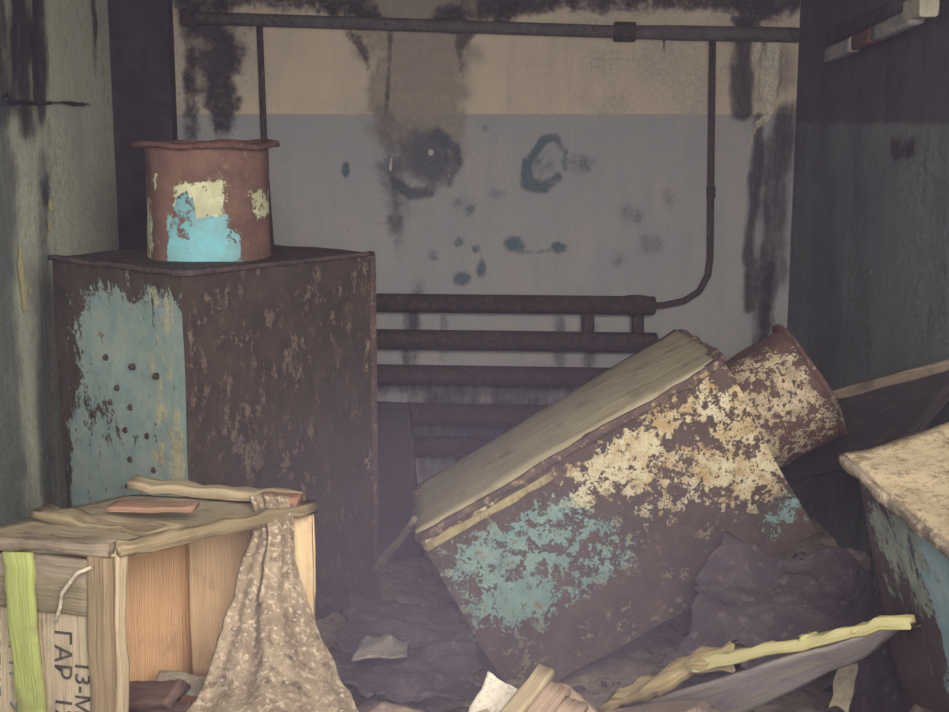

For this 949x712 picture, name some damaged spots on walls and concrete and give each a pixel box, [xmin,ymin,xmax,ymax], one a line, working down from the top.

water stain [173,0,800,27]
water stain [183,24,246,139]
water stain [348,30,474,222]
water stain [42,175,50,204]
water stain [521,135,567,192]
water stain [731,41,794,342]
water stain [0,0,48,526]
water stain [455,262,485,284]
water stain [505,237,524,251]